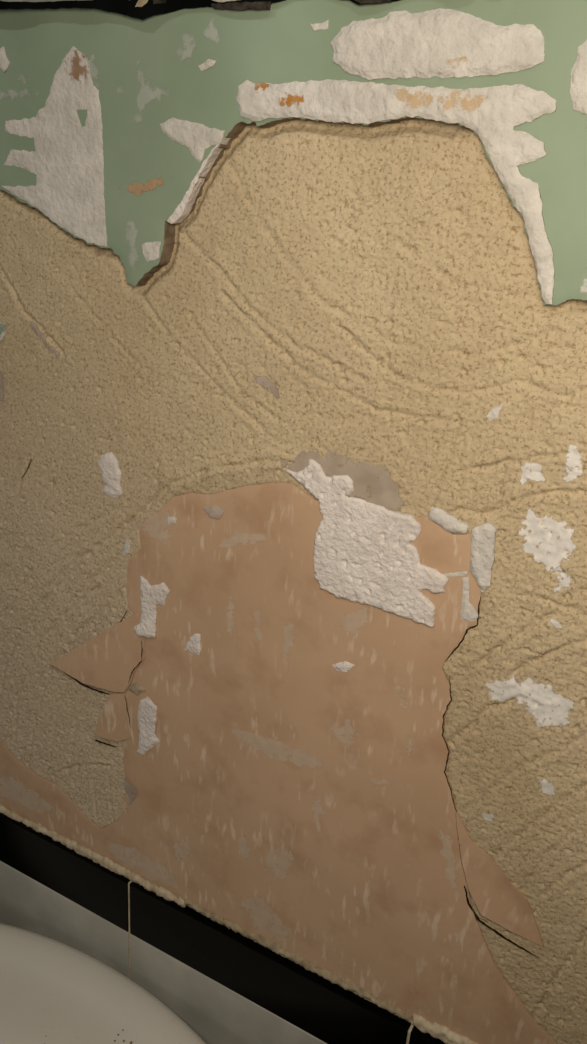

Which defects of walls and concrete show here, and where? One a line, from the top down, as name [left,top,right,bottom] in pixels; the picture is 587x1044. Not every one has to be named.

flaking render [311,20,329,31]
flaking render [0,46,10,72]
flaking render [199,59,216,71]
peeling [2,46,108,247]
flaking render [142,241,161,263]
peeling [98,452,123,498]
peeling [561,444,585,483]
crack [64,641,143,748]
peeling [0,459,557,1044]
crack [464,886,538,958]